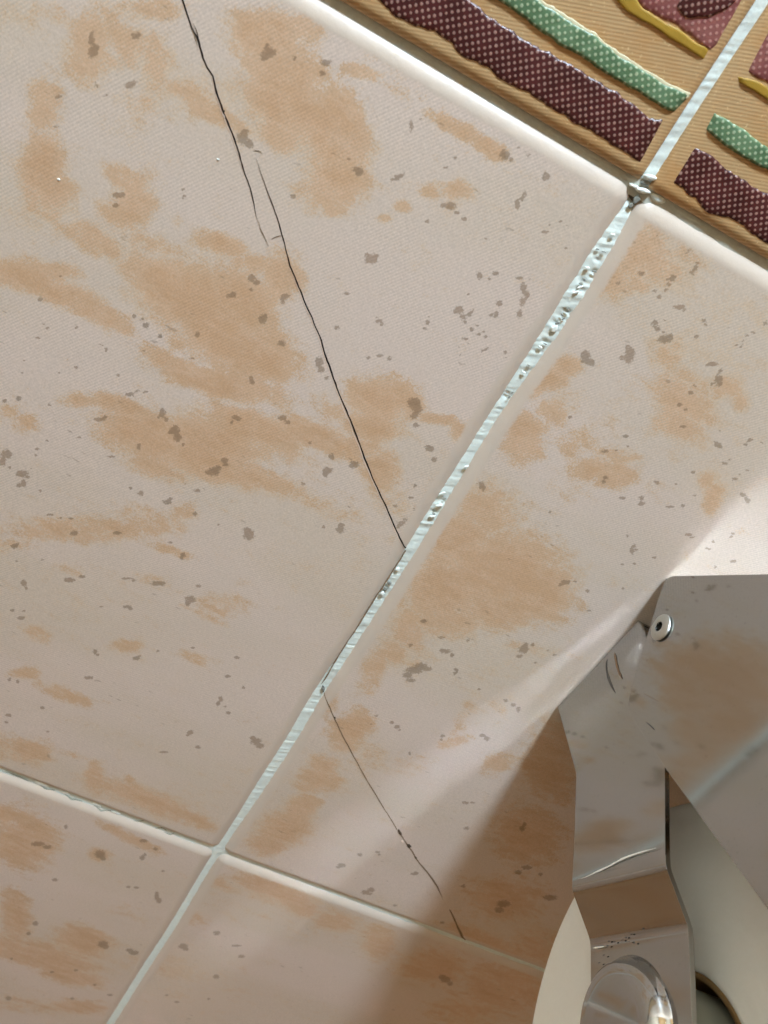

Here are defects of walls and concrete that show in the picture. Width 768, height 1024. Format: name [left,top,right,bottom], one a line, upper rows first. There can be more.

crack [182,0,466,940]